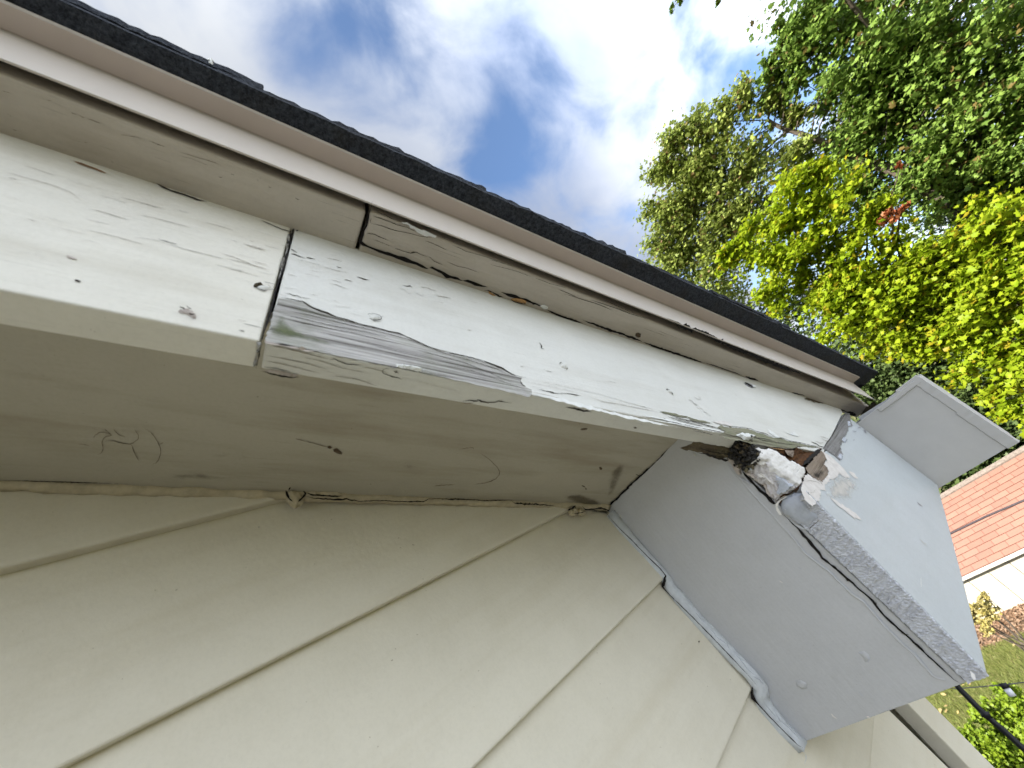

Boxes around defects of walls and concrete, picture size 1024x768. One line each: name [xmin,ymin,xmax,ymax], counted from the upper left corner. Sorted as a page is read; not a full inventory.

crack [4,113,384,386]
crack [367,212,643,318]
peeling [263,295,532,397]
peeling [717,402,877,485]